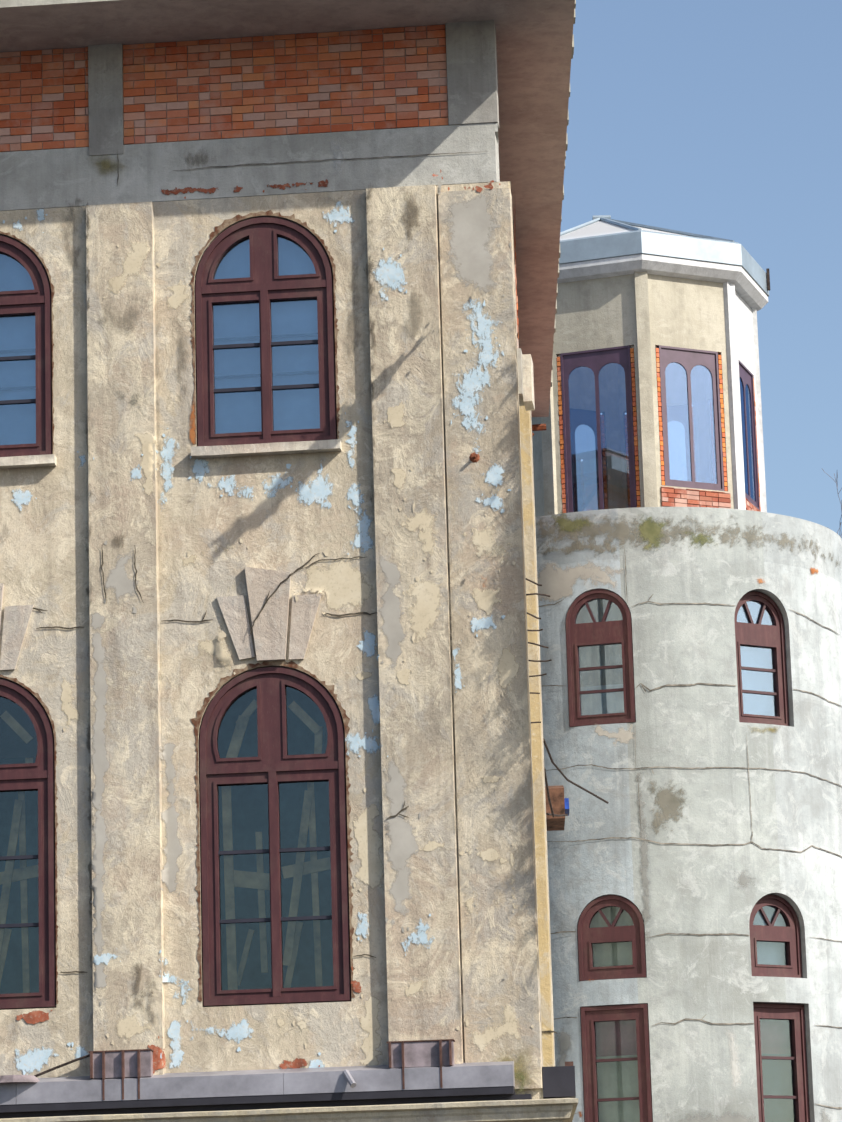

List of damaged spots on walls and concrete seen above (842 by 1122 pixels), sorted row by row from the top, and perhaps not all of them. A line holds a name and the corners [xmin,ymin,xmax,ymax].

flaking render [131,201,359,509]
peeling [451,298,517,454]
crack [249,553,365,636]
crack [324,610,377,618]
flaking render [294,468,442,668]
flaking render [452,397,622,937]
crack [636,683,736,692]
water stain [535,515,840,565]
flaking render [90,599,121,1006]
flaking render [159,631,517,1070]
crack [546,734,842,857]
crack [652,1014,754,1026]